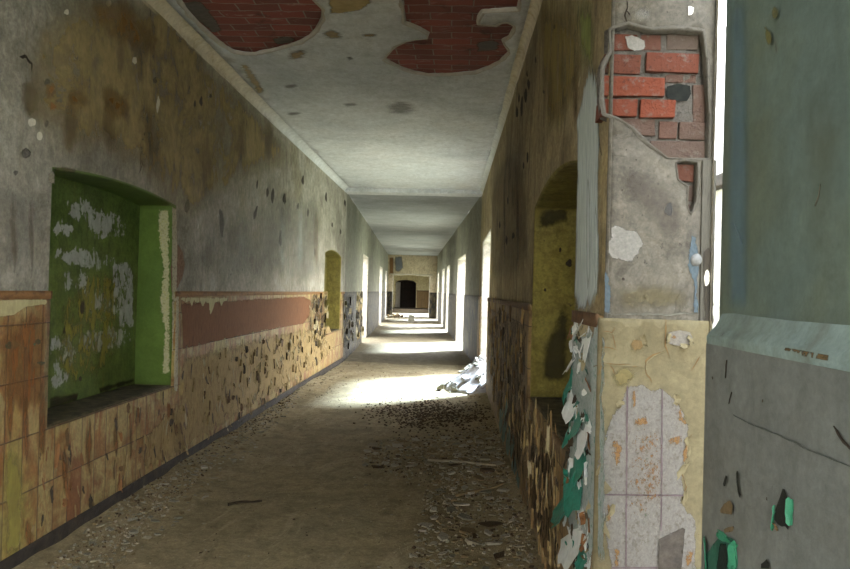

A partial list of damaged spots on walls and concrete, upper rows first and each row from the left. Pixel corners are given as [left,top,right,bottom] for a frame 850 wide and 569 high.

leakage [23,5,287,209]
spalling [176,0,326,56]
spalling [382,0,522,77]
spalling [595,21,713,216]
peeling [39,197,134,389]
peeling [105,200,364,493]
peeling [488,296,741,569]
peeling [766,489,793,531]
crack [725,360,850,467]